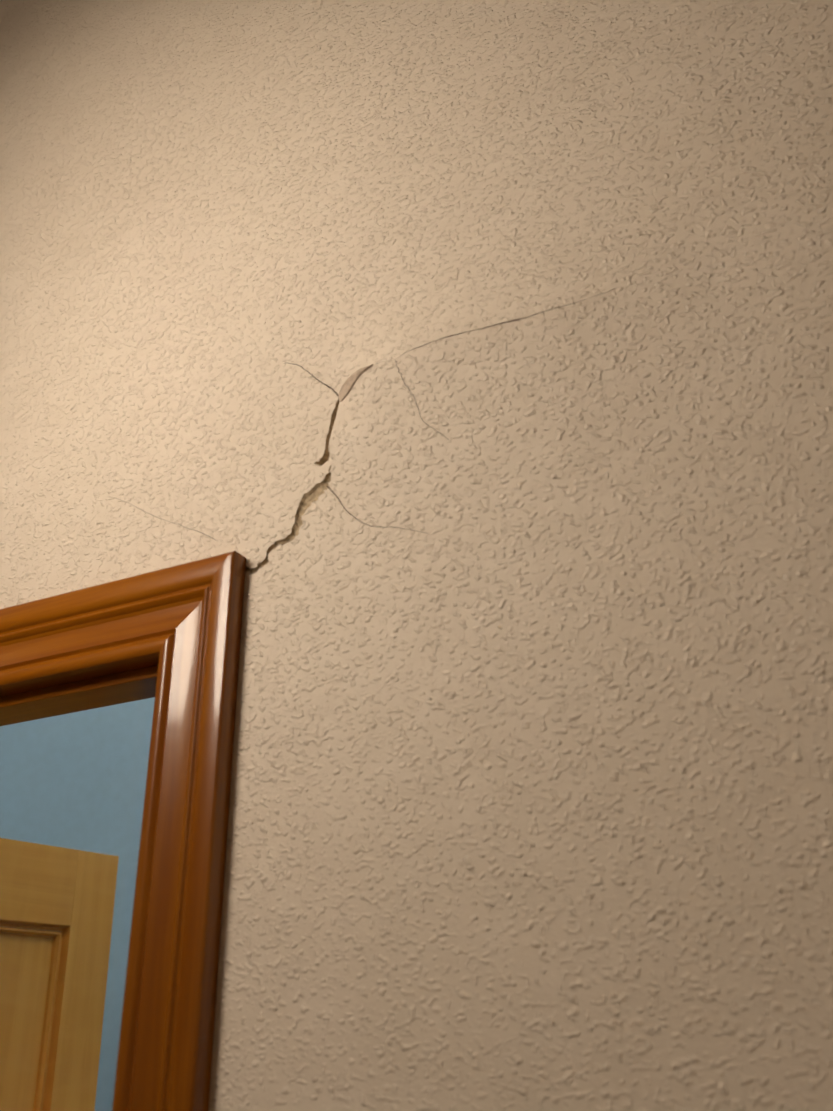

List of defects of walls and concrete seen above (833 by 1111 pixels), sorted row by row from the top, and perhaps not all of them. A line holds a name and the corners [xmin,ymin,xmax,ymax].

crack [246,363,430,574]
crack [376,287,617,439]